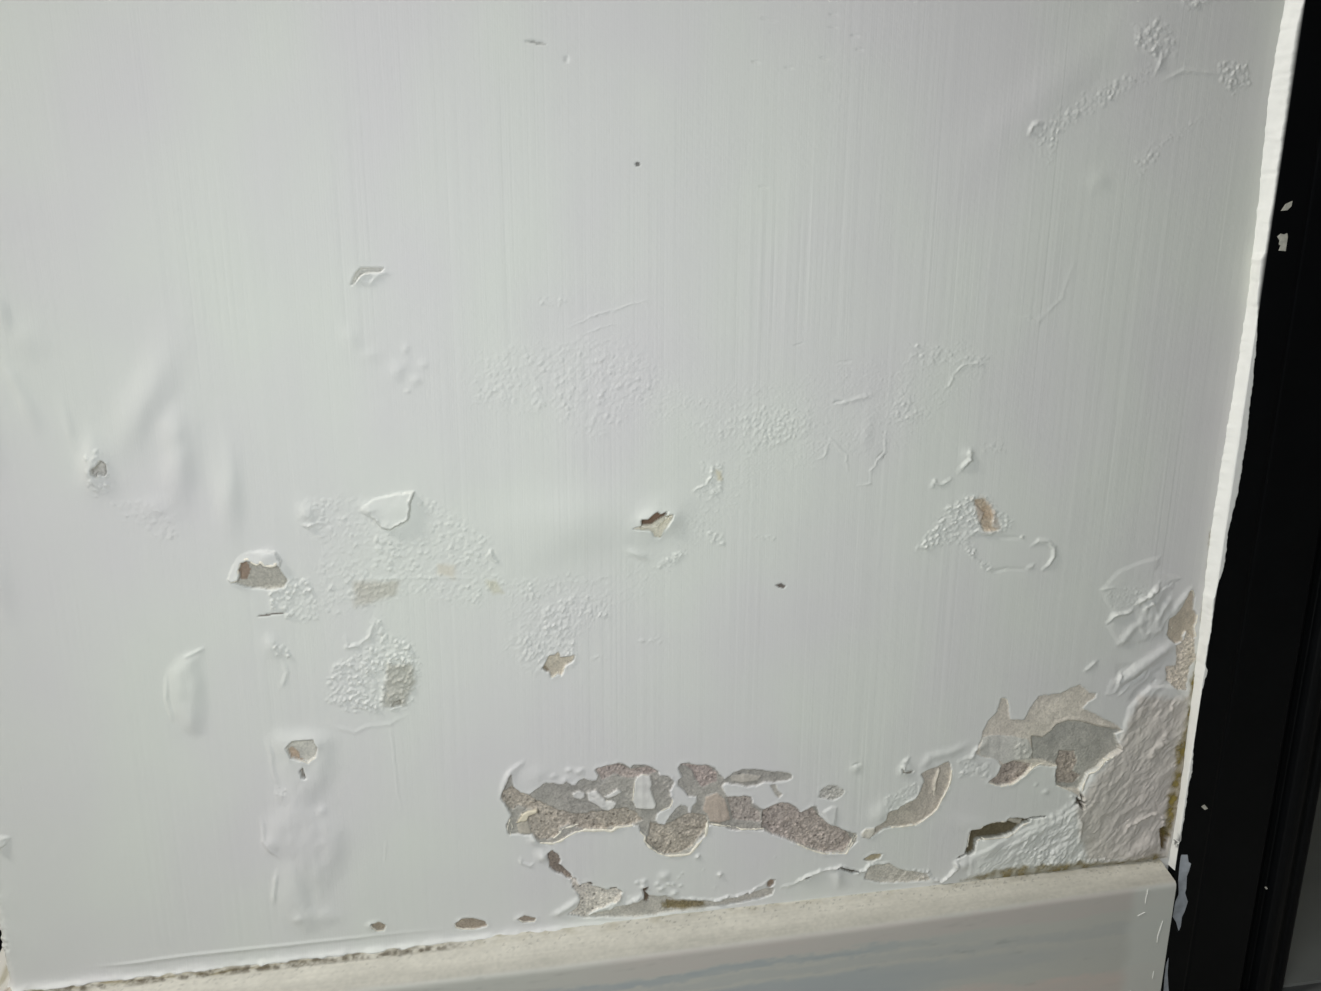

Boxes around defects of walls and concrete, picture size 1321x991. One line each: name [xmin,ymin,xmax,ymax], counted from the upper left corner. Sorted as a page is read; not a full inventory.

peeling [346,261,395,290]
peeling [365,488,418,527]
peeling [634,504,684,536]
peeling [227,545,321,624]
peeling [975,680,1122,798]
peeling [497,757,957,868]
flaking render [1159,826,1169,848]